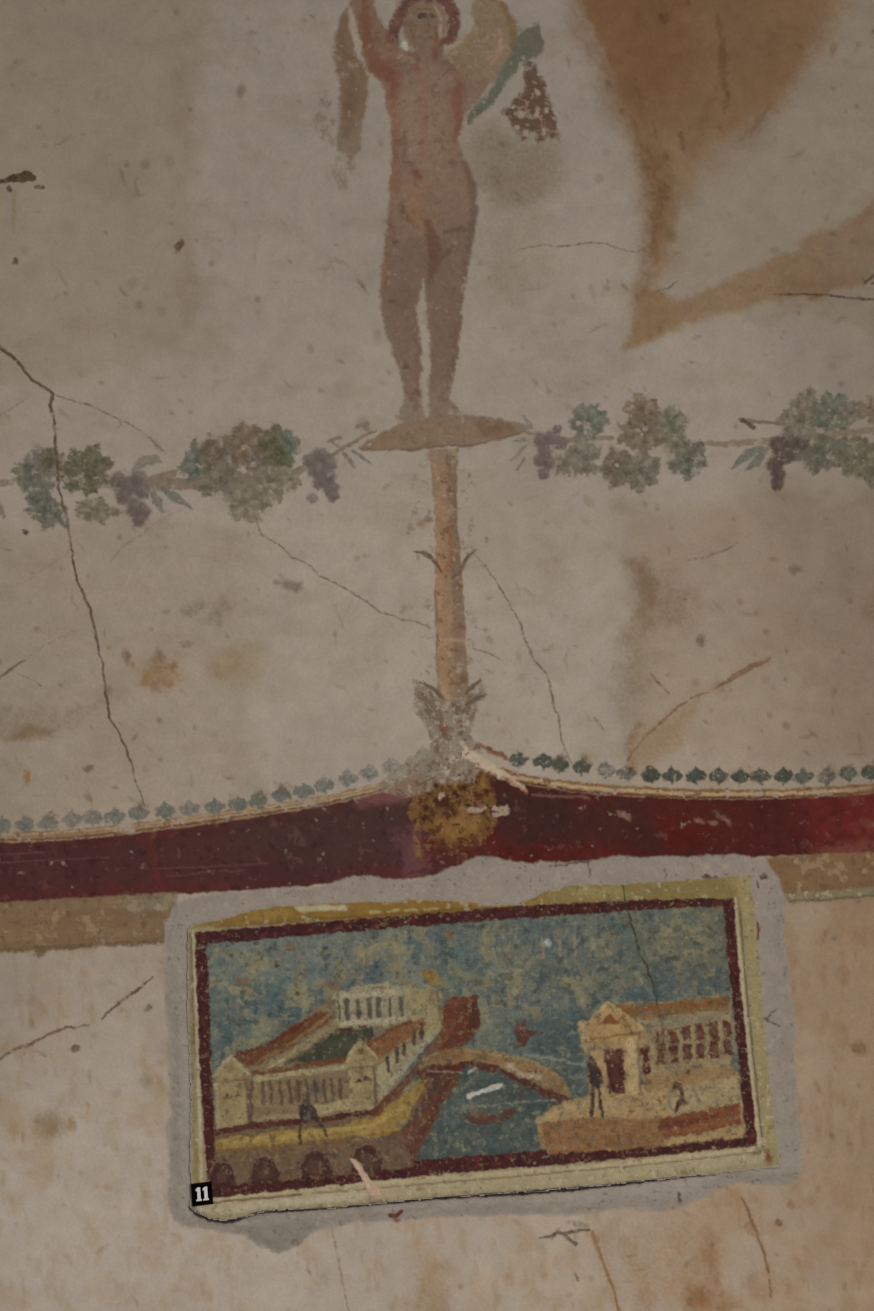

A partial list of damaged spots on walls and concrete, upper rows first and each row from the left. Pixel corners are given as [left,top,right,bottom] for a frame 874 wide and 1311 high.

damp [558,0,874,356]
crack [0,342,167,808]
crack [251,512,432,629]
crack [464,551,573,765]
crack [592,654,774,767]
crack [0,975,154,1067]